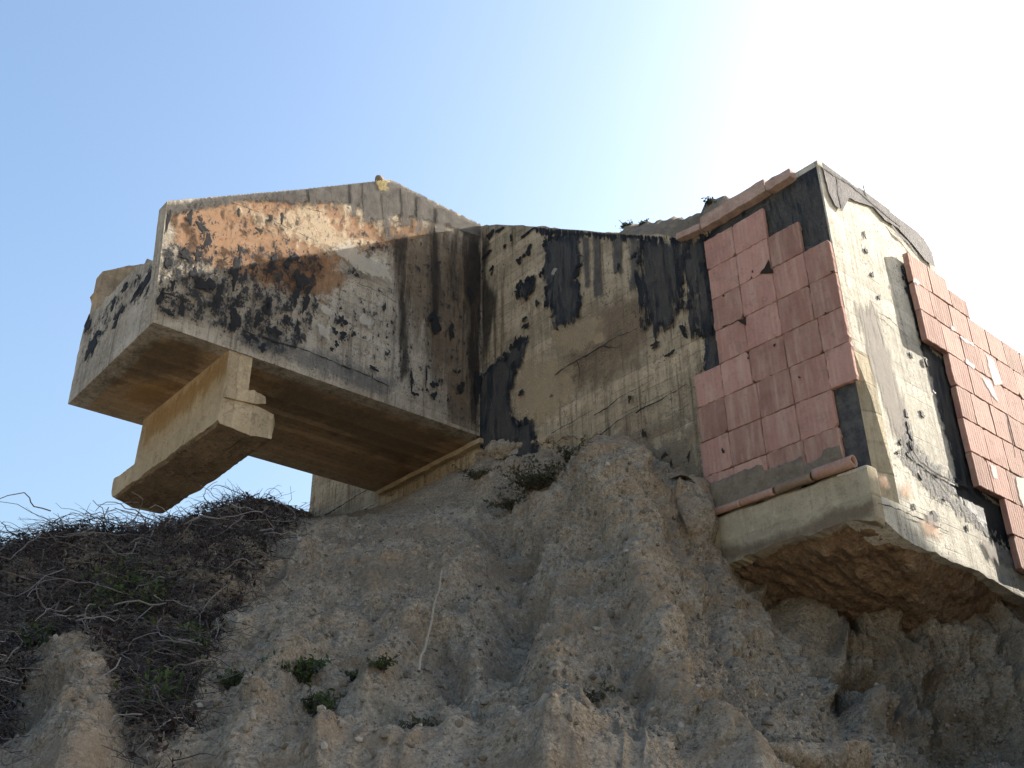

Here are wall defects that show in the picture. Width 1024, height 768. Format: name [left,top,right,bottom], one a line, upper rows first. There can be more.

rust [170,199,430,302]
damp [168,180,679,426]
crack [555,329,635,385]
spalling [721,347,925,558]
spalling [913,504,940,529]